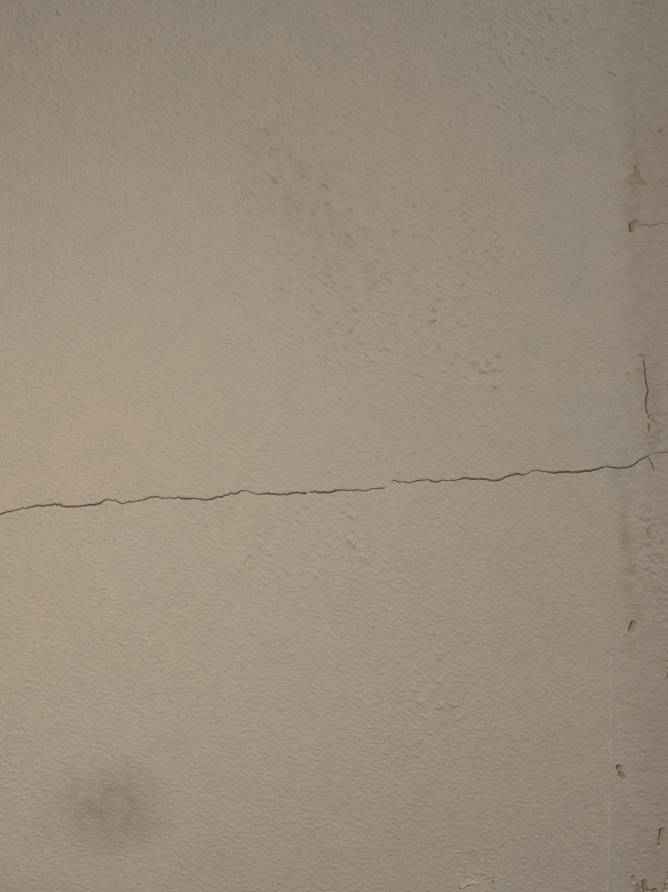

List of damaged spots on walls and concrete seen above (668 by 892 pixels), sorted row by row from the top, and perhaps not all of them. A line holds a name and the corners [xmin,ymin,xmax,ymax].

crack [642,359,650,433]
crack [0,452,666,515]